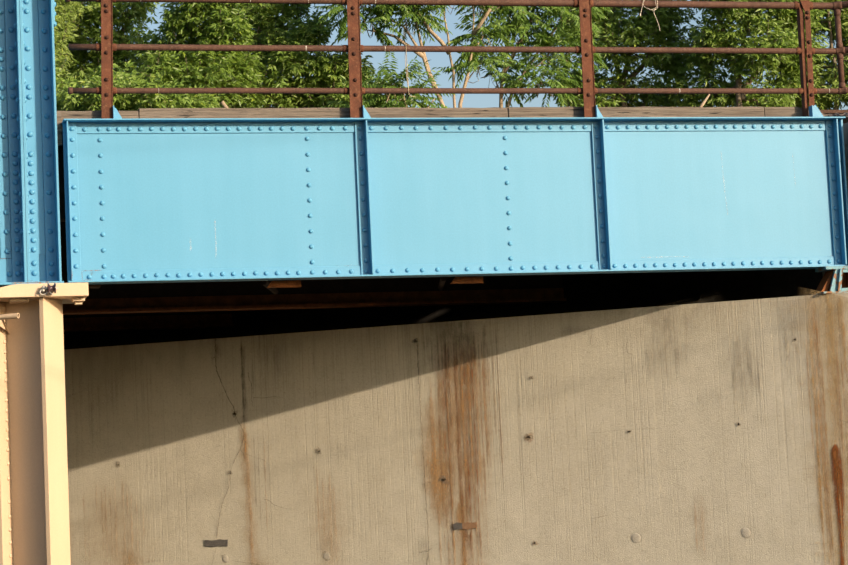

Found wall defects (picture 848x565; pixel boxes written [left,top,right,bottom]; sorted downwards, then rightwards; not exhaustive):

corrosion [426,346,489,521]
corrosion [817,428,848,565]